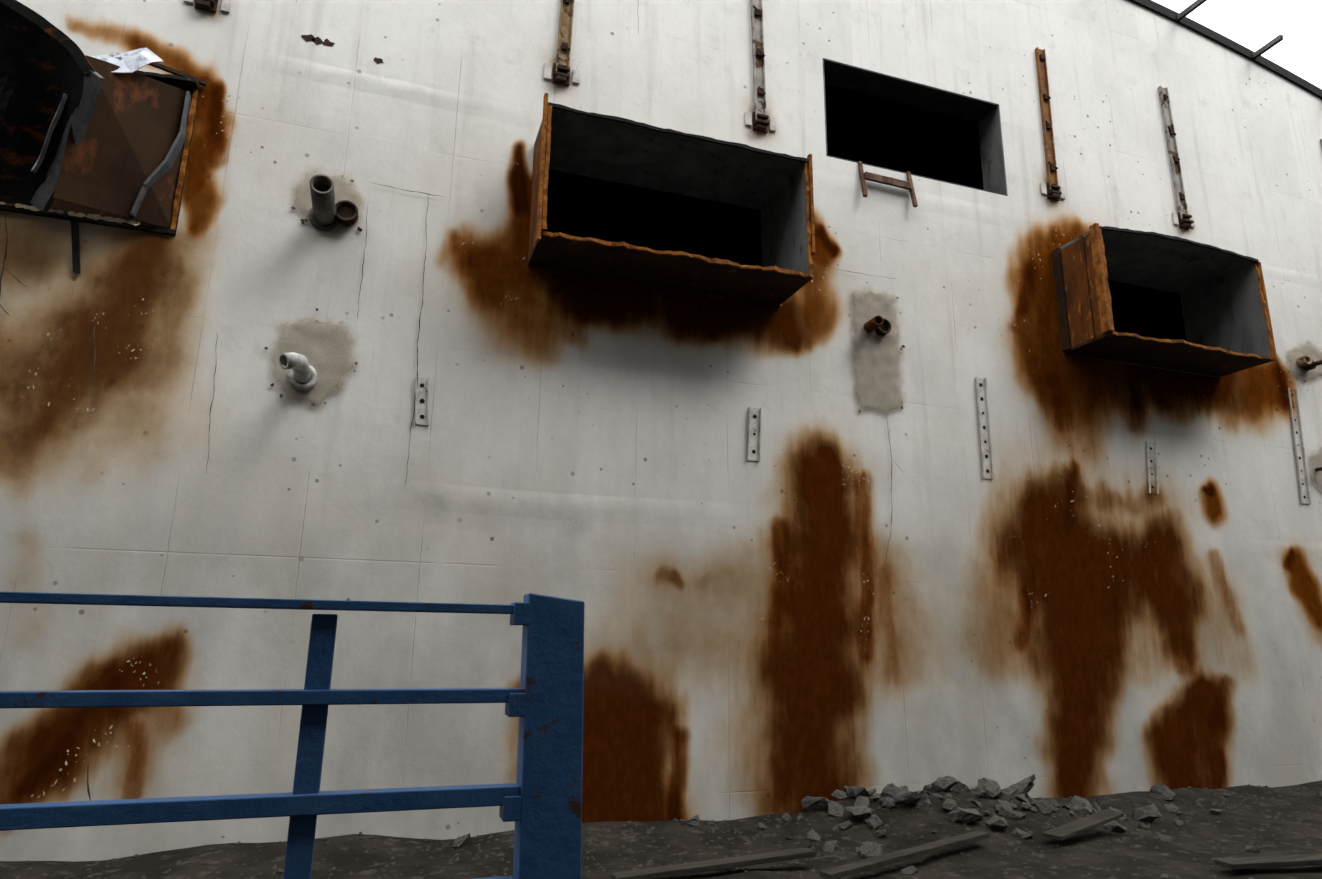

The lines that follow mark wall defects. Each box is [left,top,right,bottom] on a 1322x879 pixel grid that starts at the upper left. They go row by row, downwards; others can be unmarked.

rust [127,34,240,234]
rust [0,232,187,463]
rust [455,143,840,352]
rust [1007,218,1294,423]
rust [0,707,144,804]
rust [71,634,184,690]
rust [582,655,685,823]
rust [760,436,878,814]
rust [996,467,1203,798]
rust [1146,673,1230,790]
rust [1203,482,1222,522]
rust [1286,551,1322,629]